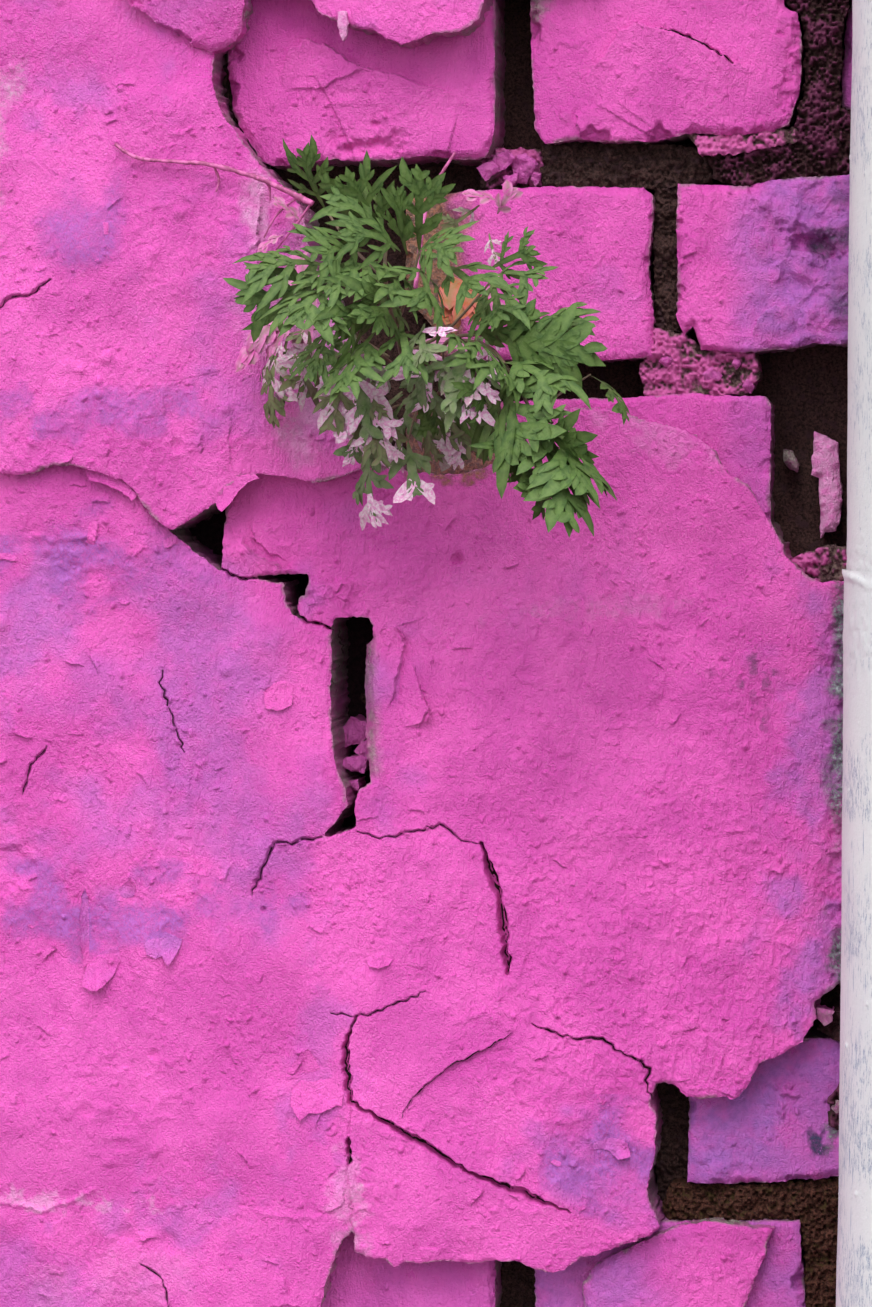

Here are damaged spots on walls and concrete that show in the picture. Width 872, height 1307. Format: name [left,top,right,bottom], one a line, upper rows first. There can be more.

peeling [216,474,259,512]
crack [22,748,46,795]
crack [159,671,185,753]
crack [189,508,512,972]
crack [331,991,653,1202]
peeling [591,1129,631,1160]